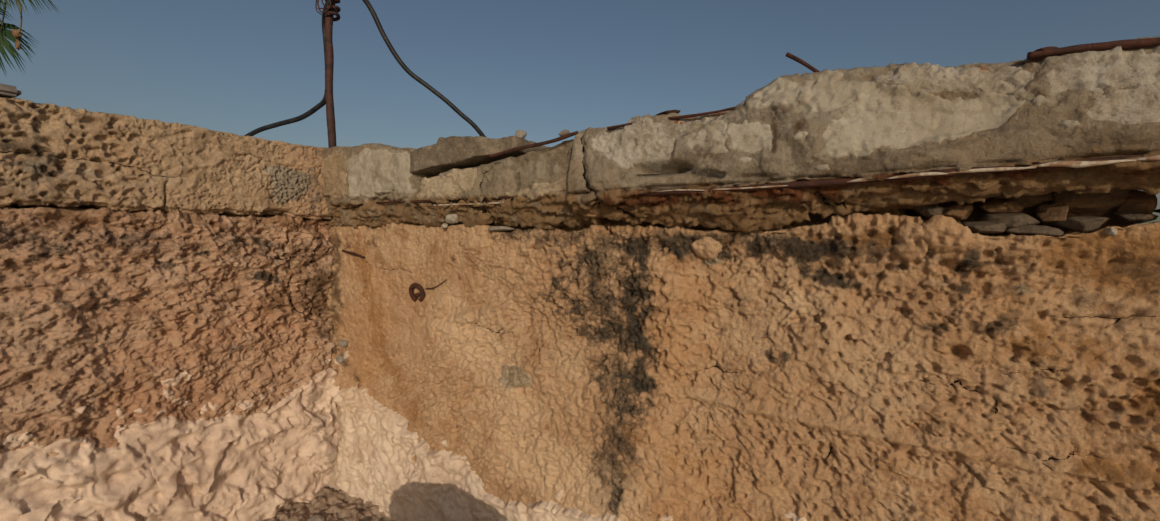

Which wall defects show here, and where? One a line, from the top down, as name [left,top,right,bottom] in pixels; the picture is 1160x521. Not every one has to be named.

spalling [591,37,1160,196]
spalling [489,131,578,158]
crack [0,151,190,206]
crack [560,134,637,224]
rust [605,168,859,209]
rust [873,172,953,196]
rust [968,168,1074,186]
water stain [534,227,872,515]
crack [1007,442,1105,470]